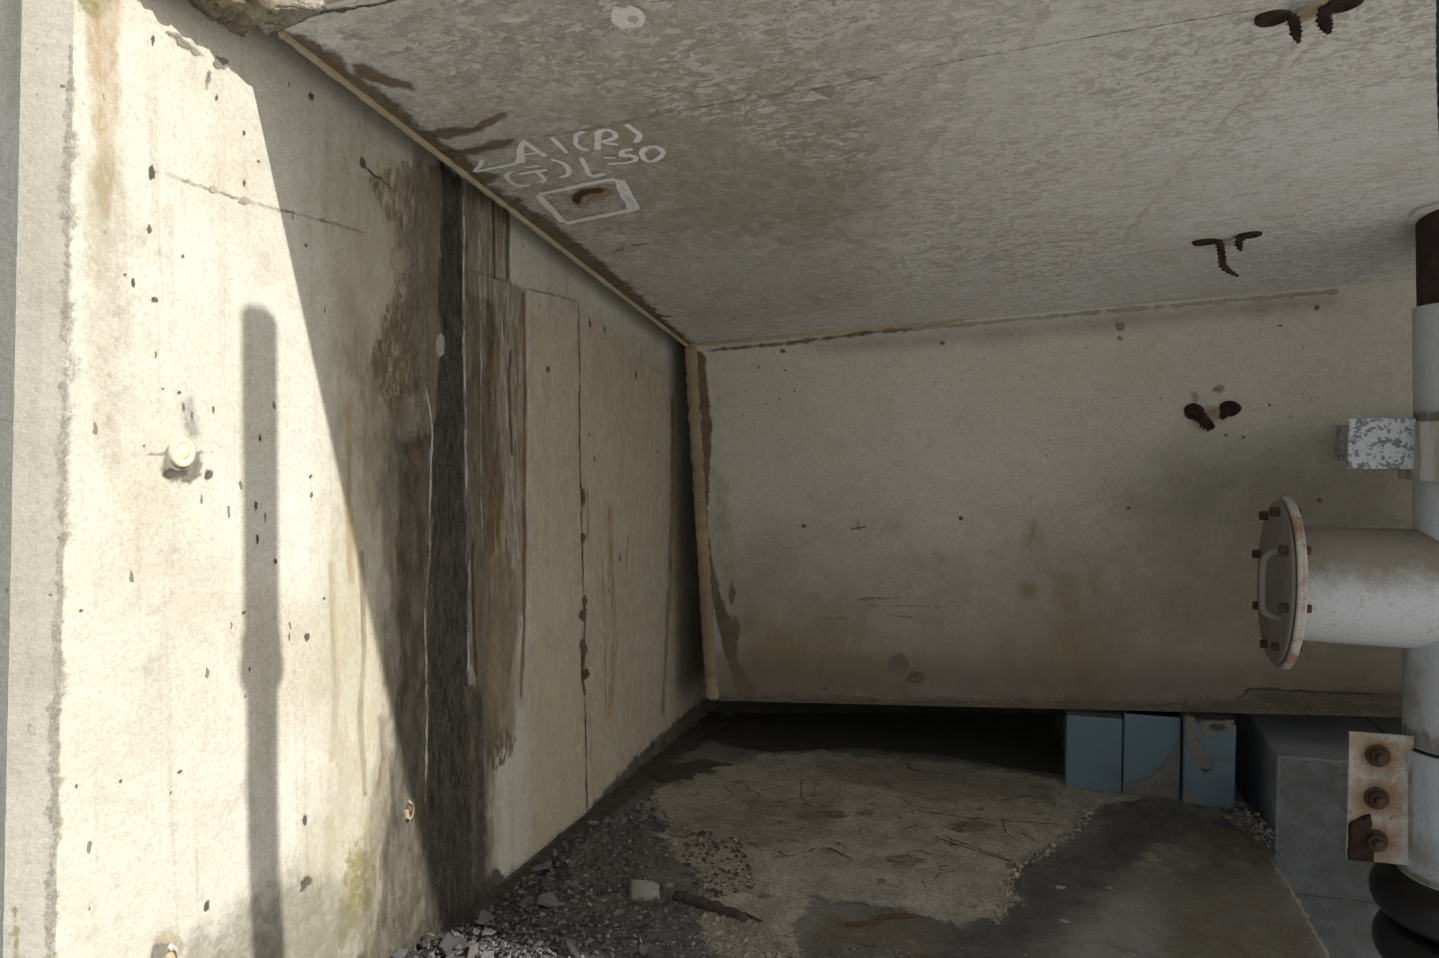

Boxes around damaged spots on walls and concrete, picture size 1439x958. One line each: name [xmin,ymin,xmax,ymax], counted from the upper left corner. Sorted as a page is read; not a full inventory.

water stain [287,0,1402,958]
corrosion [1297,0,1328,22]